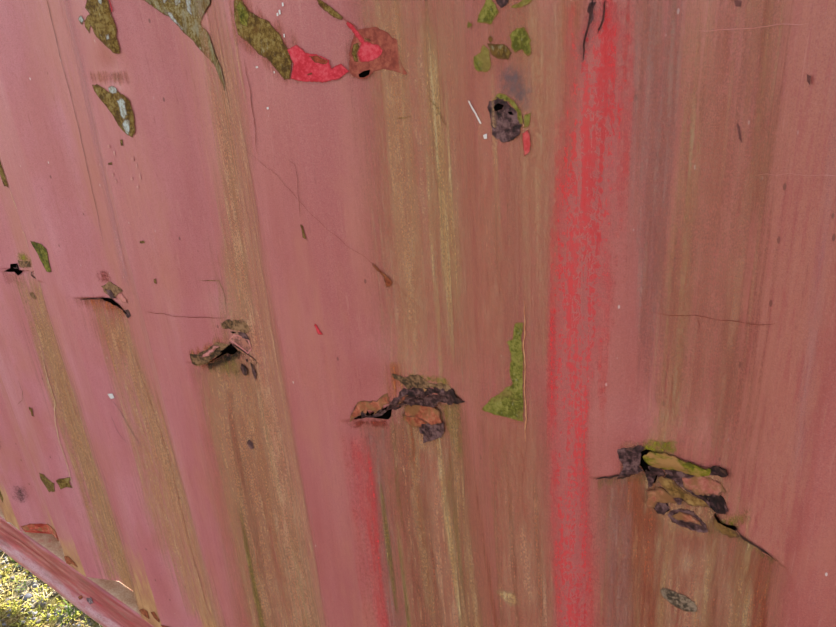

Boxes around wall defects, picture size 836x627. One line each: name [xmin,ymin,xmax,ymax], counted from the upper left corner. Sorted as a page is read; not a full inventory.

peeling [78,0,120,54]
peeling [144,0,237,132]
peeling [234,0,292,80]
peeling [467,0,532,28]
peeling [473,27,532,72]
peeling [92,74,135,183]
peeling [482,303,527,442]
rust [381,405,484,627]
rust [660,588,697,612]